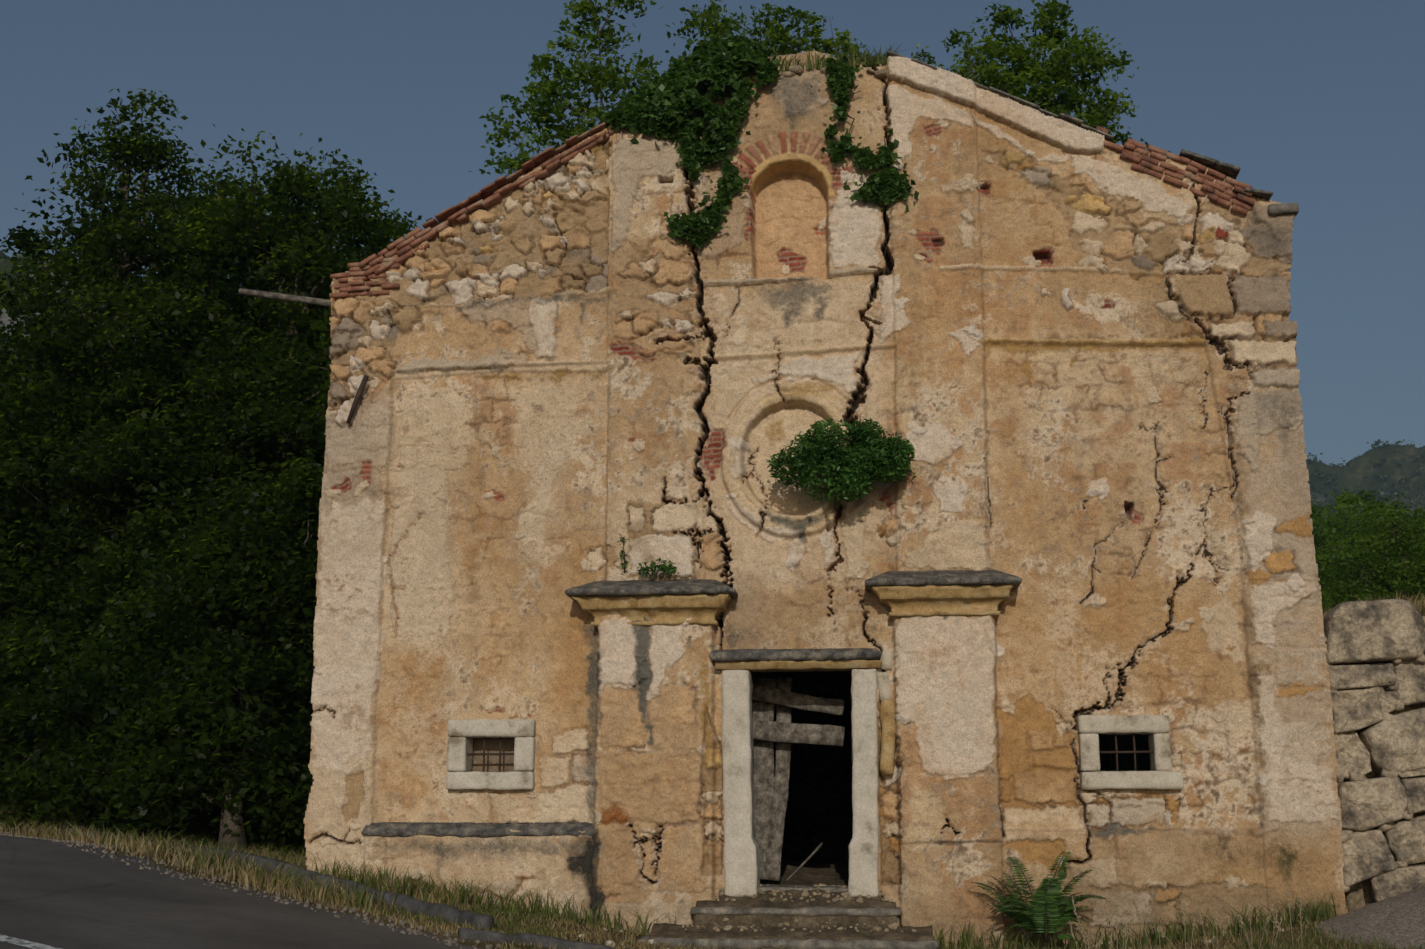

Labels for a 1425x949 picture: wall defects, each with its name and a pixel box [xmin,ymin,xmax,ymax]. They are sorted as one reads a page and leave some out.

crack [683,169,695,215]
crack [843,204,895,426]
crack [872,64,892,166]
spalling [886,84,1298,402]
spalling [309,69,916,909]
crack [656,249,740,646]
crack [743,453,768,524]
crack [827,504,869,639]
crack [1059,183,1251,877]
crack [998,802,1006,836]